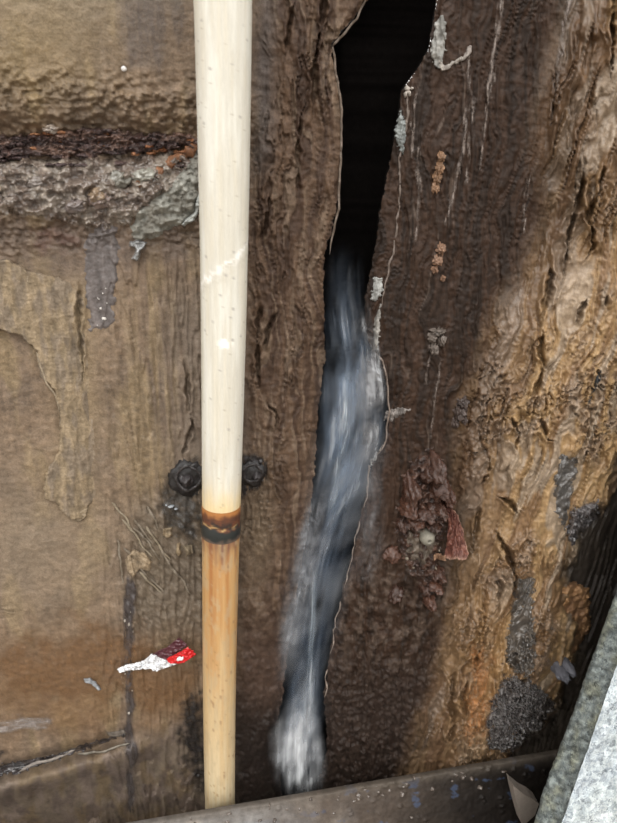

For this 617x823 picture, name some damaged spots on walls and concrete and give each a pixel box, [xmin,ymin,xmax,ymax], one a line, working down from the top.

crack [275,0,472,796]
water stain [317,0,571,790]